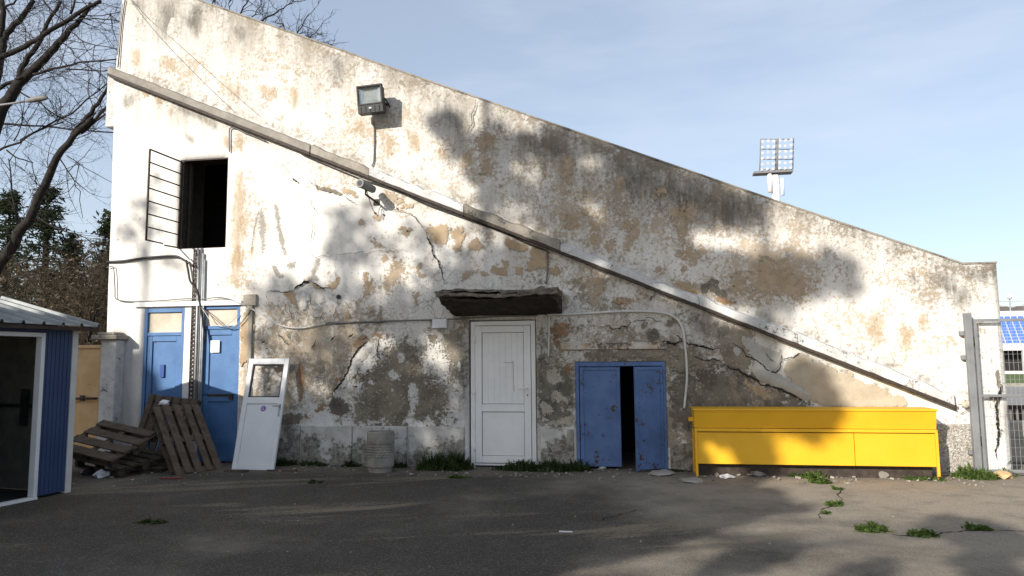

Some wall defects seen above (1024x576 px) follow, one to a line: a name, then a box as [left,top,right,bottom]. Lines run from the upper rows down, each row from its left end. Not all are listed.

crack [258,178,445,395]
peeling [398,222,485,253]
peeling [459,236,559,282]
spalling [281,412,303,425]
spalling [327,332,462,427]
crack [574,294,807,404]
spalling [583,318,913,436]
crack [995,385,1013,466]